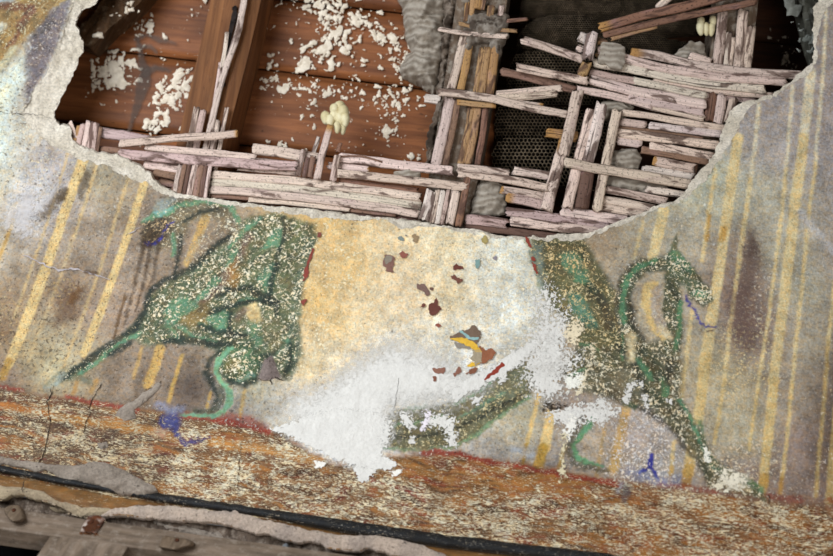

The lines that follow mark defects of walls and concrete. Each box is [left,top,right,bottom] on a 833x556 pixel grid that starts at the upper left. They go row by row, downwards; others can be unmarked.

flaking render [21,0,833,274]
flaking render [115,382,161,421]
peeling [270,279,650,483]
peeling [703,447,754,498]
corrosion [79,519,102,535]